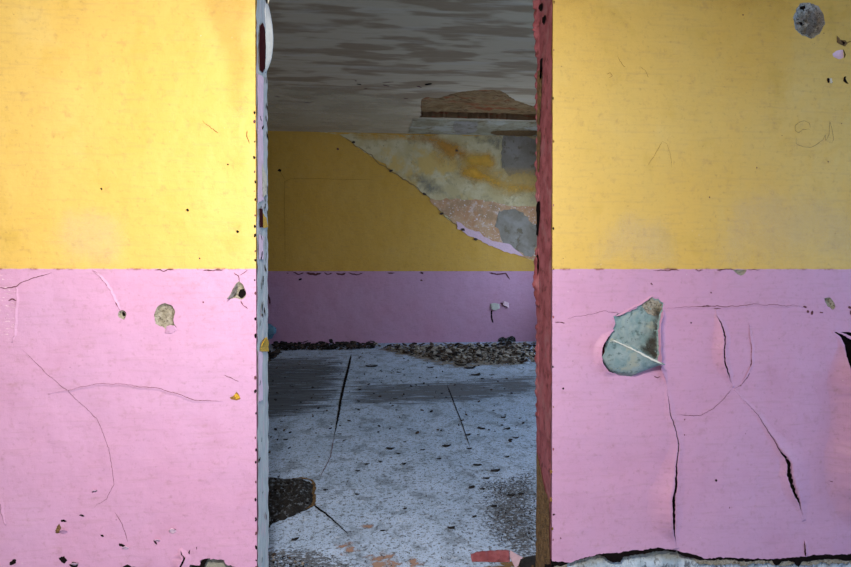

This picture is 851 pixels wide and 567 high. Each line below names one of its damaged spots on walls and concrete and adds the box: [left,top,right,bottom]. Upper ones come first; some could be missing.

spalling [793,3,825,39]
peeling [253,0,273,262]
peeling [325,0,546,308]
spalling [154,303,177,334]
spalling [227,271,256,309]
crack [260,236,271,325]
peeling [593,295,668,386]
crack [0,273,223,538]
crack [320,356,351,477]
crack [447,387,469,443]
crack [646,304,813,556]
peeling [471,453,851,567]